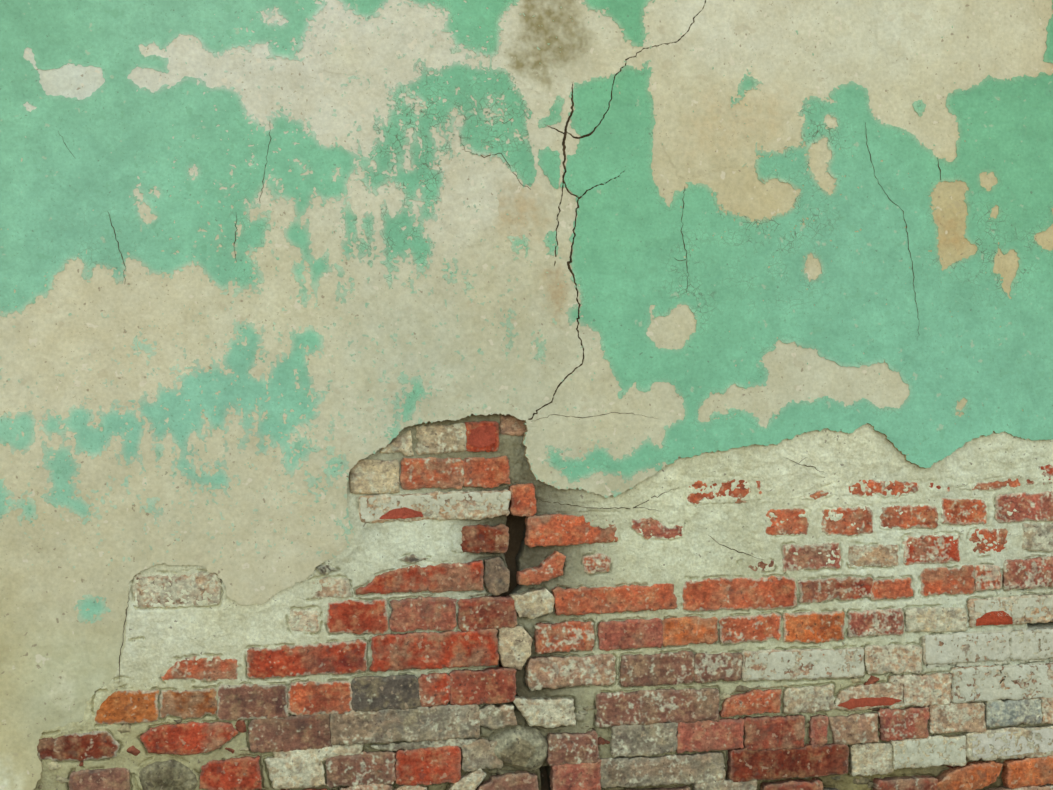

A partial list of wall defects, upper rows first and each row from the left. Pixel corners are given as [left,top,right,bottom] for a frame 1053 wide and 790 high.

peeling [23,47,105,100]
peeling [127,0,515,157]
crack [461,143,531,190]
crack [472,0,706,421]
peeling [426,0,1053,517]
crack [865,122,919,333]
peeling [0,165,516,694]
crack [453,520,519,596]
crack [496,659,530,698]
peeling [745,649,865,681]
peeling [925,596,1053,703]
peeling [894,728,1053,769]